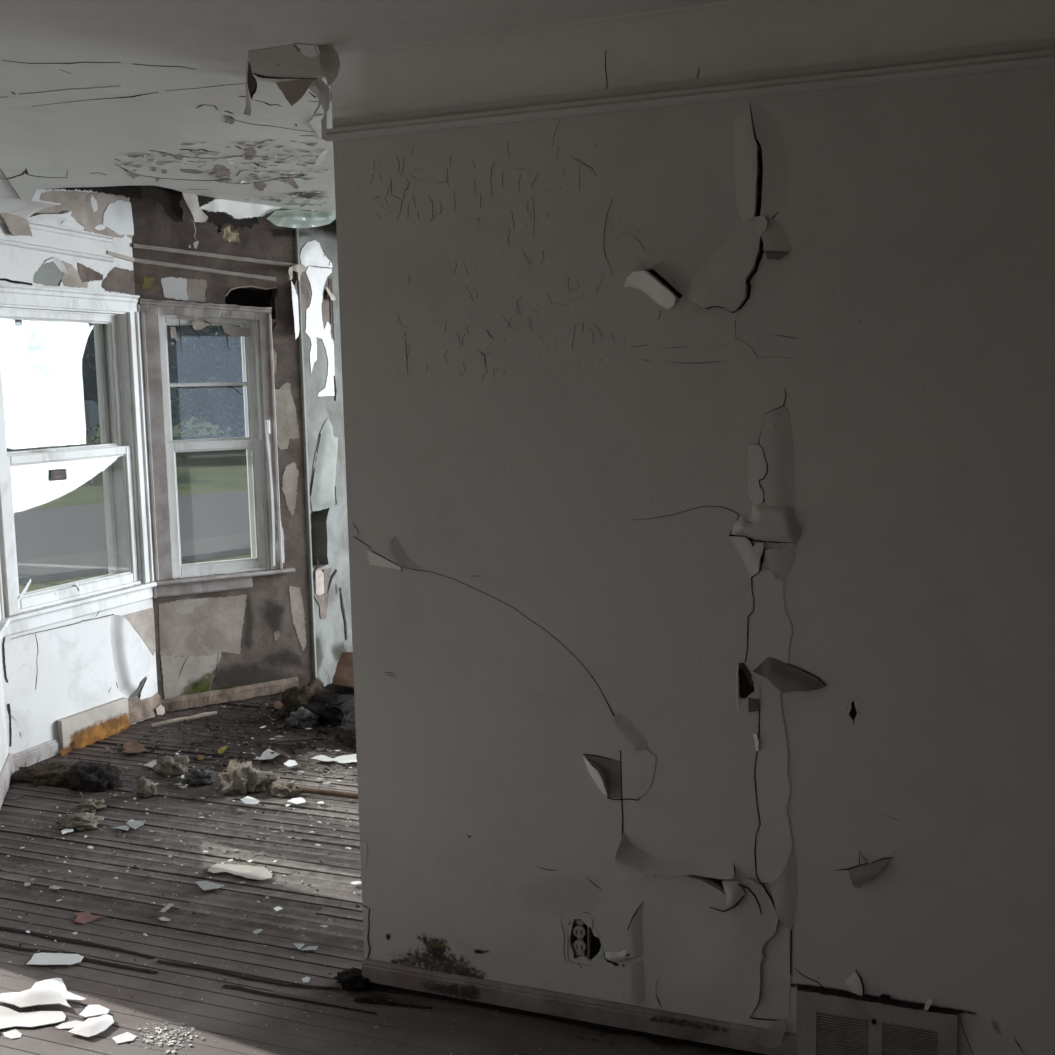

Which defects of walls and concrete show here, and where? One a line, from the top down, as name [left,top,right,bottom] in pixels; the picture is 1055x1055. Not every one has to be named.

peeling [115,43,340,222]
flaking render [0,190,134,238]
crack [685,101,799,359]
spalling [225,289,262,307]
peeling [288,240,336,396]
crack [328,279,336,341]
crack [748,388,796,506]
peeling [110,594,247,715]
crack [313,559,347,640]
crack [353,524,649,751]
peeling [657,536,826,1021]
leakage [391,936,489,1002]